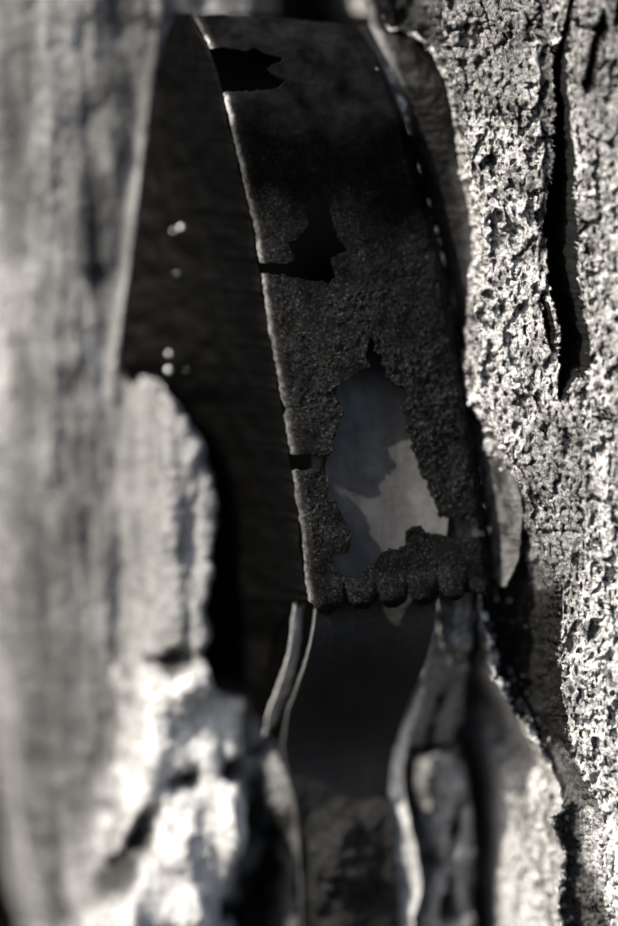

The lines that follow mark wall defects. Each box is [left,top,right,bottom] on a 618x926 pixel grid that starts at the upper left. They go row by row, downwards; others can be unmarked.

crack [534,0,618,402]
peeling [263,602,305,737]
peeling [389,604,438,926]
spalling [472,526,492,537]
spalling [479,545,610,926]